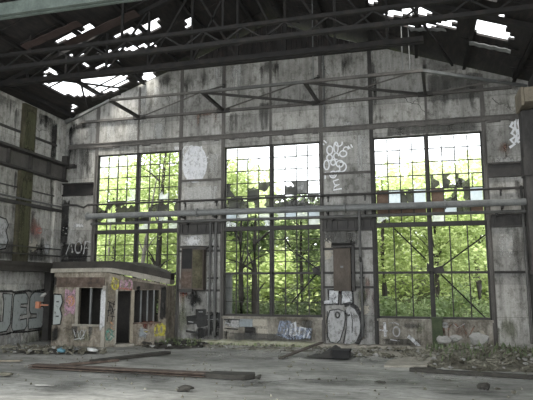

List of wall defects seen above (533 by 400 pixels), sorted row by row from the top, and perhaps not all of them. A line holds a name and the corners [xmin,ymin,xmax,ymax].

damp [47,120,57,159]